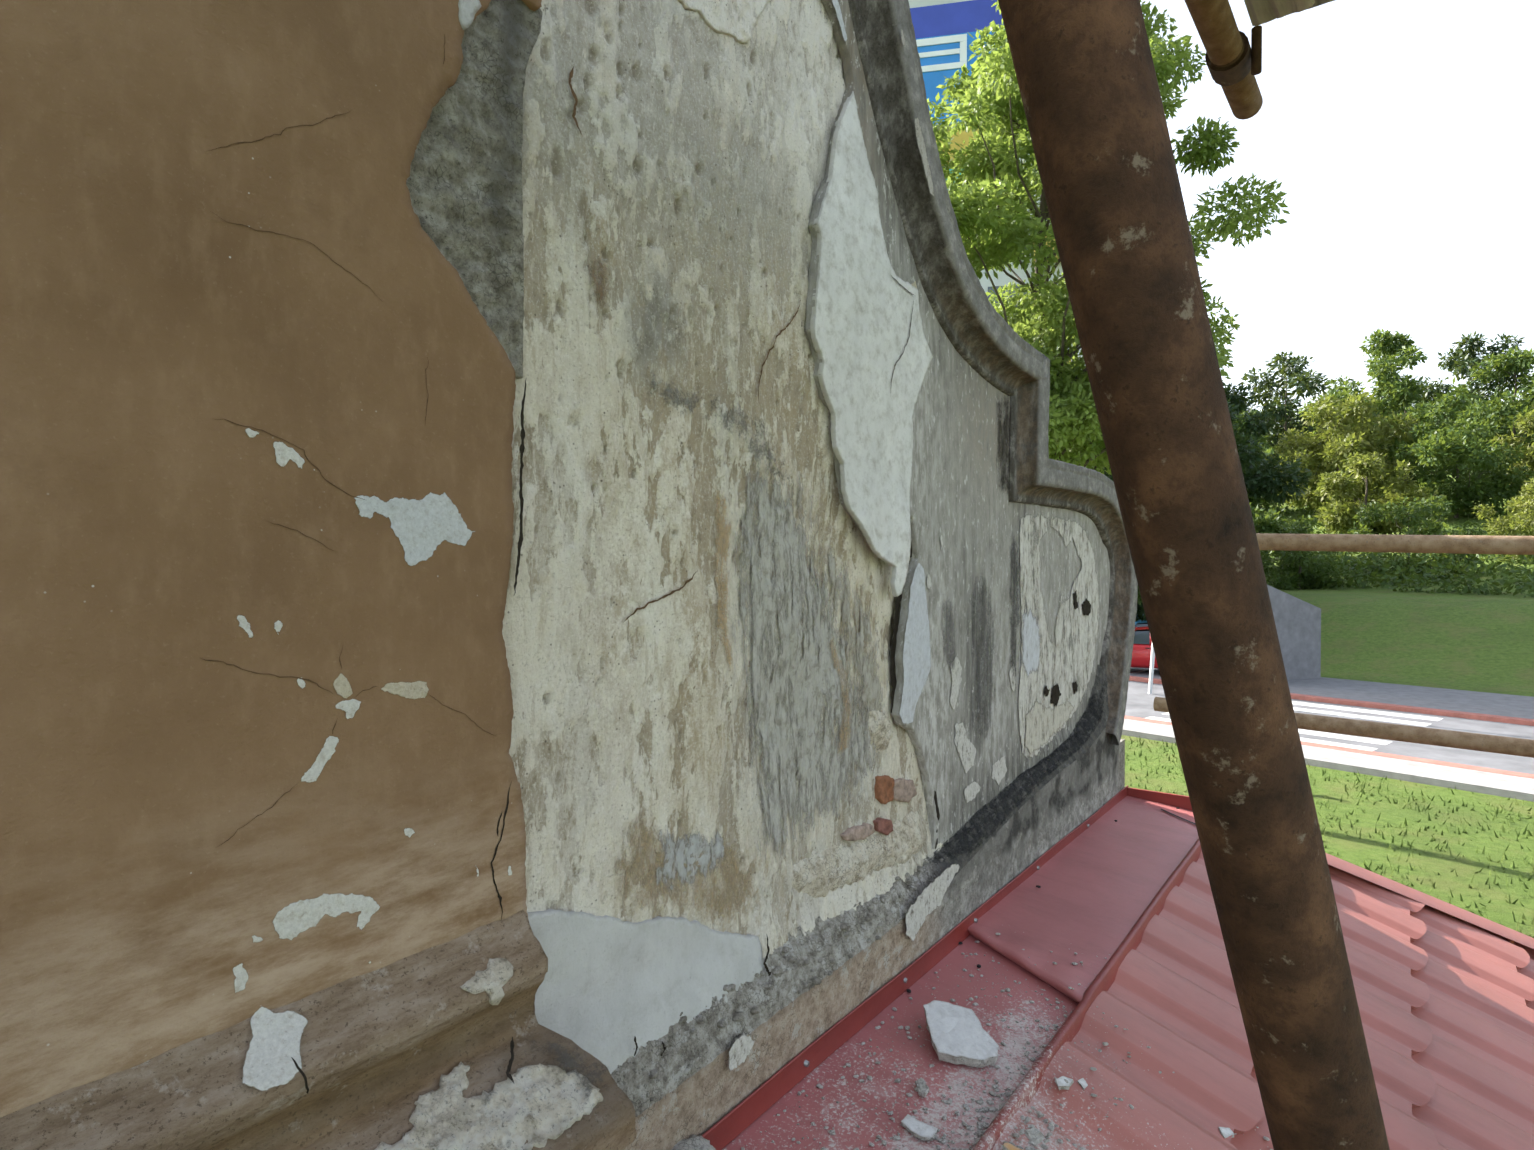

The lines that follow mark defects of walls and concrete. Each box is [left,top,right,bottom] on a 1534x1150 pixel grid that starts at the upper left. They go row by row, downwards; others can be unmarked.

crack [209,112,348,151]
spalling [406,0,542,379]
crack [212,212,381,300]
flaking render [810,91,934,753]
peeling [354,492,475,566]
crack [201,647,377,734]
peeling [950,514,1100,803]
crack [216,782,299,848]
crack [491,781,512,920]
peeling [252,893,380,943]
peeling [242,1007,308,1091]
flaking render [375,1062,604,1150]